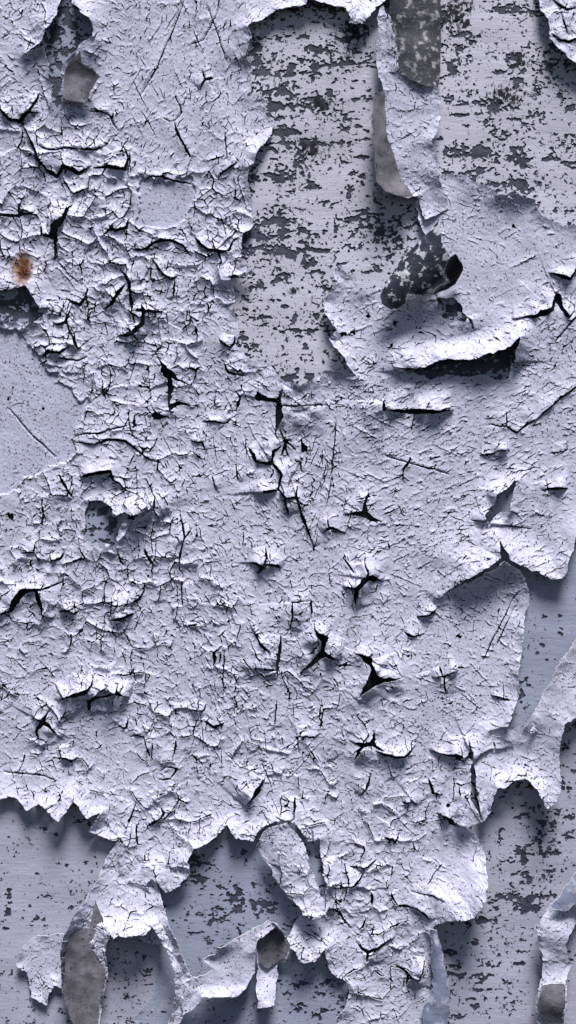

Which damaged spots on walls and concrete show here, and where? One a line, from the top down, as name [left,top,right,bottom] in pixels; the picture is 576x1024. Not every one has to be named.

peeling [15,0,104,131]
crack [0,93,192,185]
peeling [216,0,576,399]
rust [12,253,32,283]
peeling [0,274,65,339]
crack [514,256,576,343]
peeling [72,490,164,562]
crack [0,219,402,781]
crack [349,730,479,825]
peeling [422,464,576,1024]
peeling [0,783,361,1024]
crack [330,834,429,987]